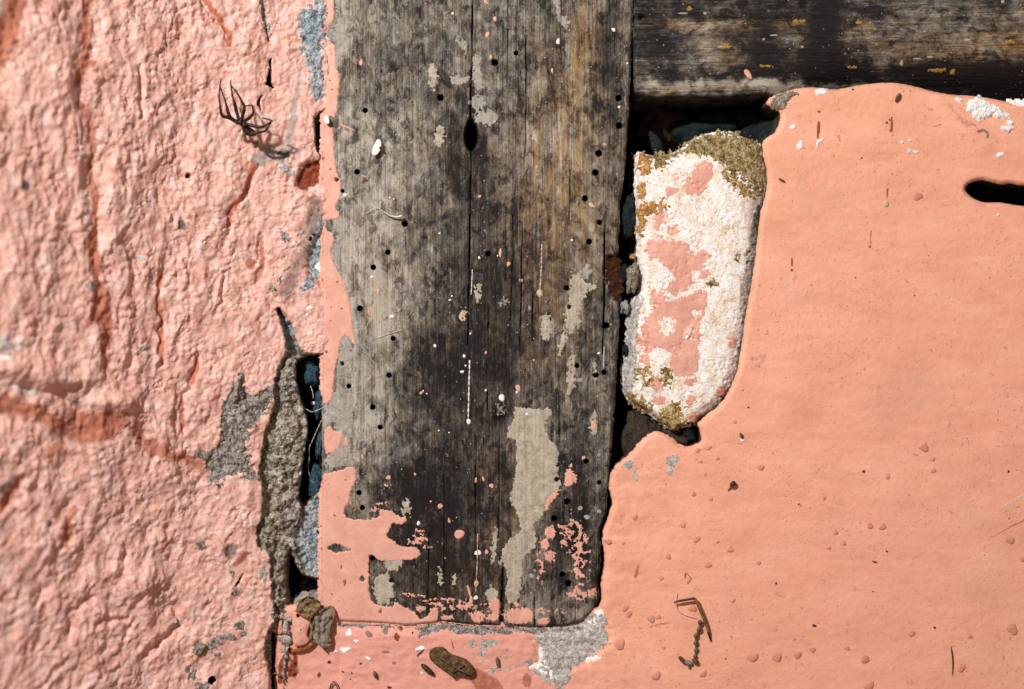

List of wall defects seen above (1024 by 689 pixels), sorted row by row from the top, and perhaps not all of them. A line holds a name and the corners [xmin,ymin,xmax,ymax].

spalling [196,0,610,689]
spalling [618,128,766,444]